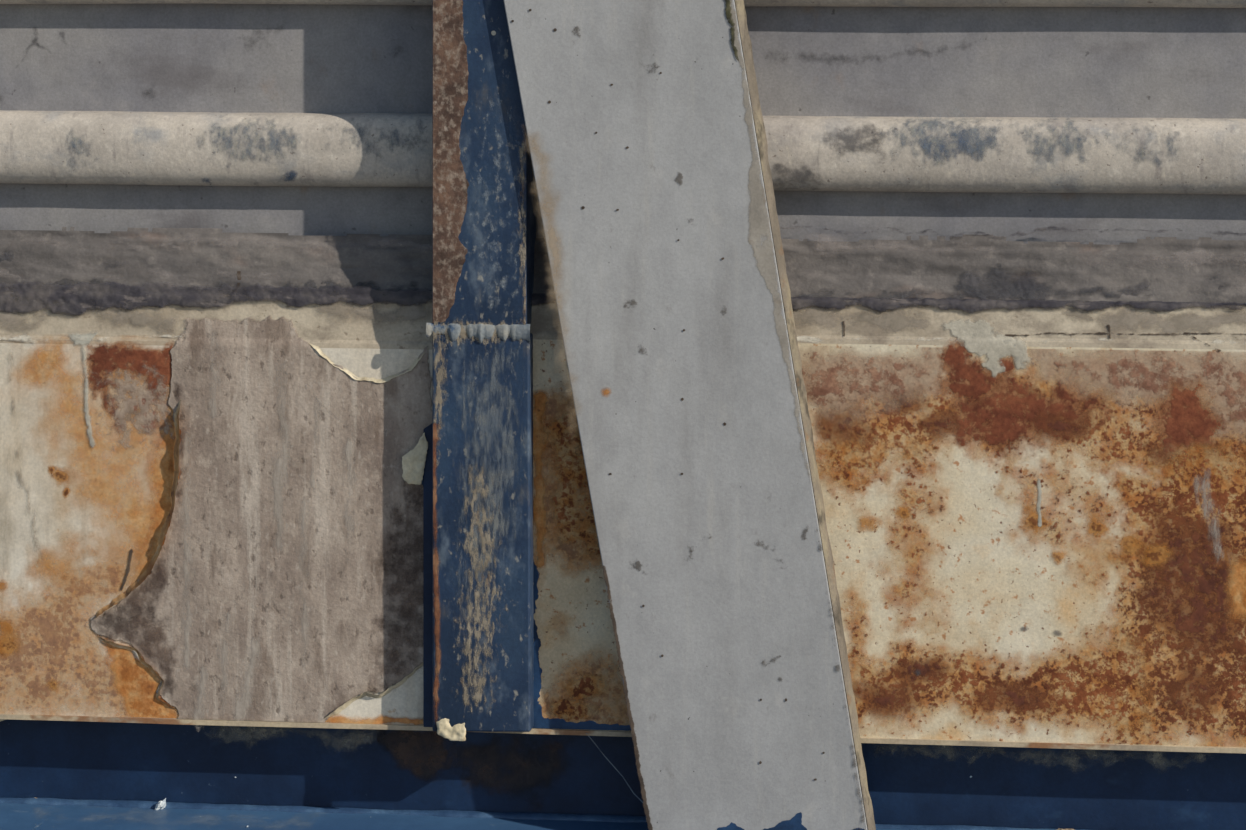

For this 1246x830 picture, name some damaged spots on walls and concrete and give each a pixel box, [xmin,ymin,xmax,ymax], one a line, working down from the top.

rust [433,0,469,323]
rust [0,342,182,718]
peeling [90,316,432,726]
rust [533,390,602,571]
rust [802,341,1246,747]
peeling [436,718,466,741]
rust [541,654,630,725]
peeling [717,822,744,830]
peeling [763,812,807,830]